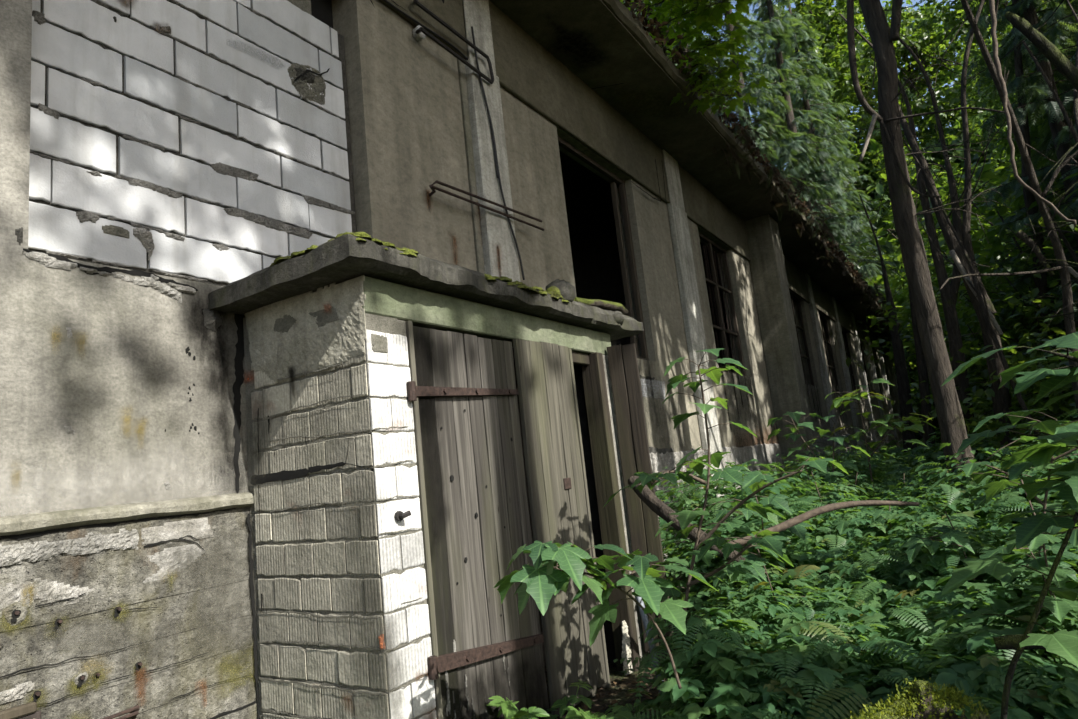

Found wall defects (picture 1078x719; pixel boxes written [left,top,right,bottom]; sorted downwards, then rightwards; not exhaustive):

spalling [287,63,330,105]
spalling [15,225,196,303]
crack [0,314,421,719]
peeling [0,517,213,583]
peeling [0,578,94,618]